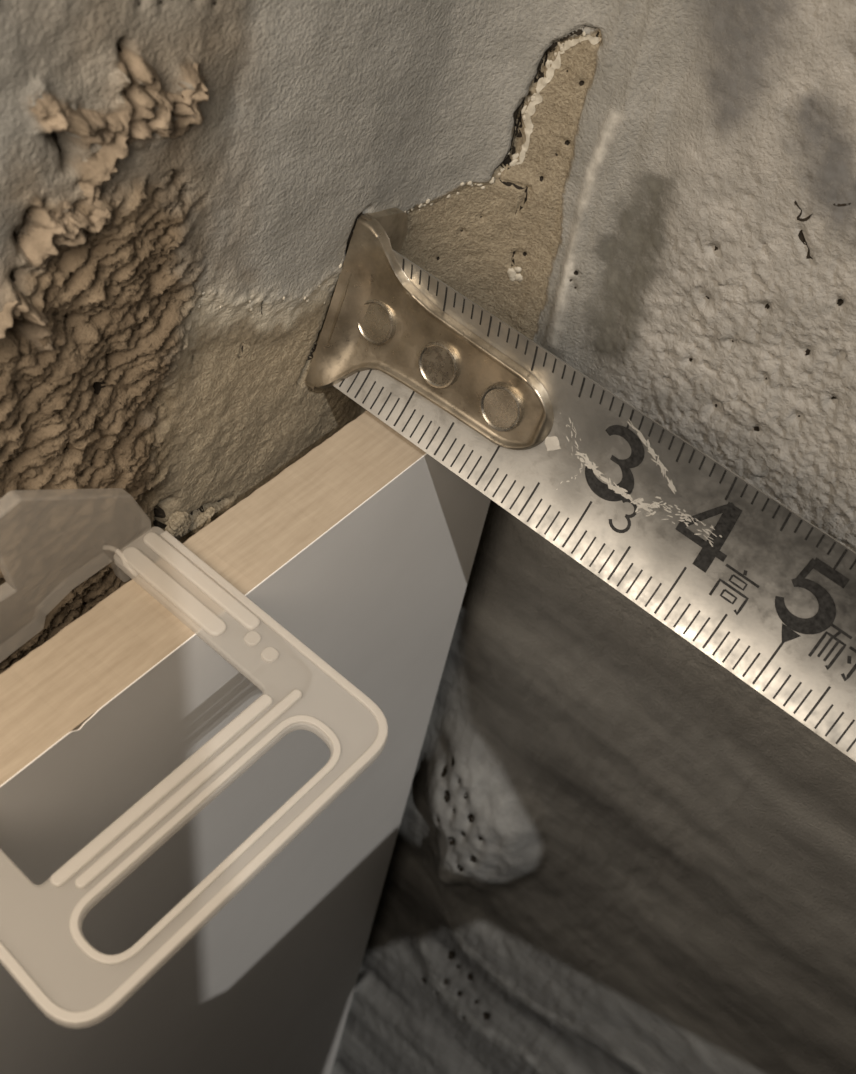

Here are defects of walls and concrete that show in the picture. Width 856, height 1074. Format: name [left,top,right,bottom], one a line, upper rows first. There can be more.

flaking render [400,29,602,341]
flaking render [0,271,56,352]
spalling [92,381,106,395]
flaking render [159,296,355,543]